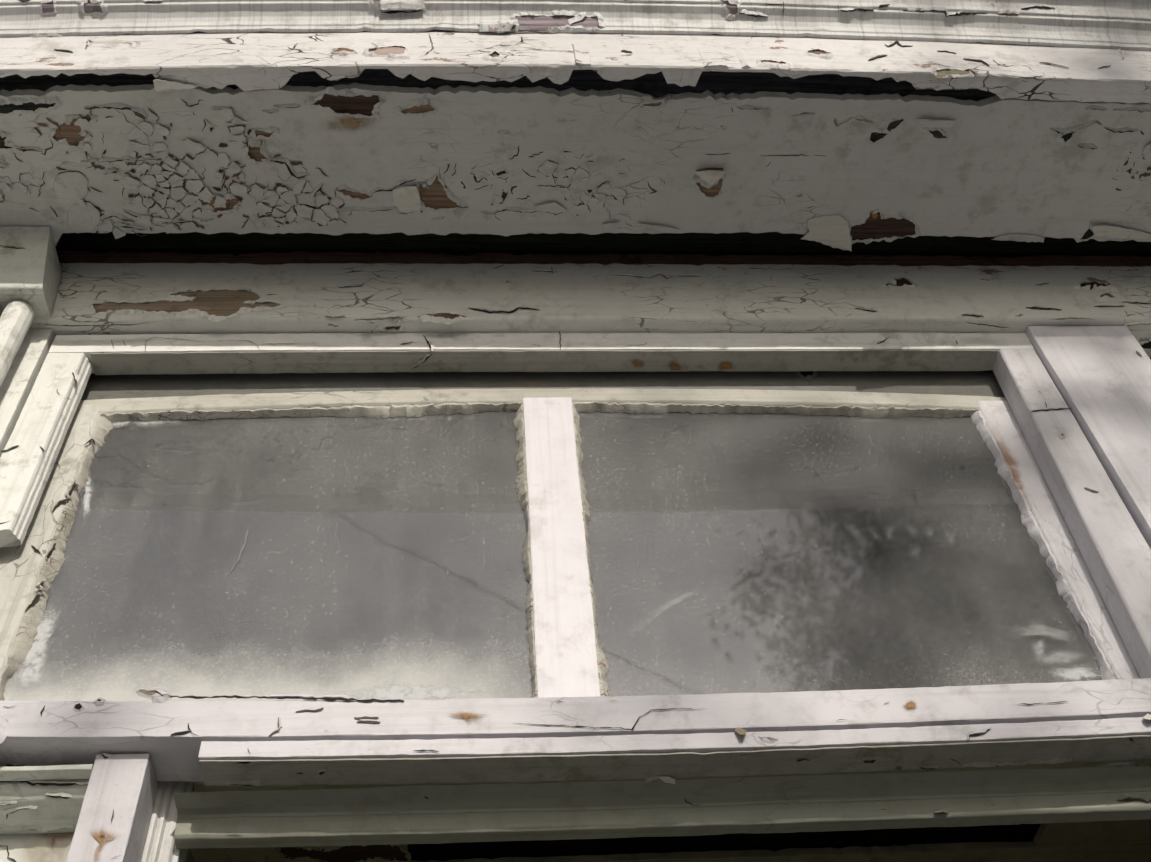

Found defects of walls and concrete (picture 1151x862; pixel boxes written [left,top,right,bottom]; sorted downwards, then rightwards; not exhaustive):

peeling [366,0,426,10]
peeling [510,10,605,34]
peeling [331,45,412,59]
peeling [804,48,833,60]
peeling [304,86,439,120]
crack [1050,105,1151,191]
crack [0,99,685,239]
peeling [393,173,469,213]
peeling [801,209,922,251]
peeling [88,288,282,322]
crack [0,763,89,862]
peeling [272,845,412,862]